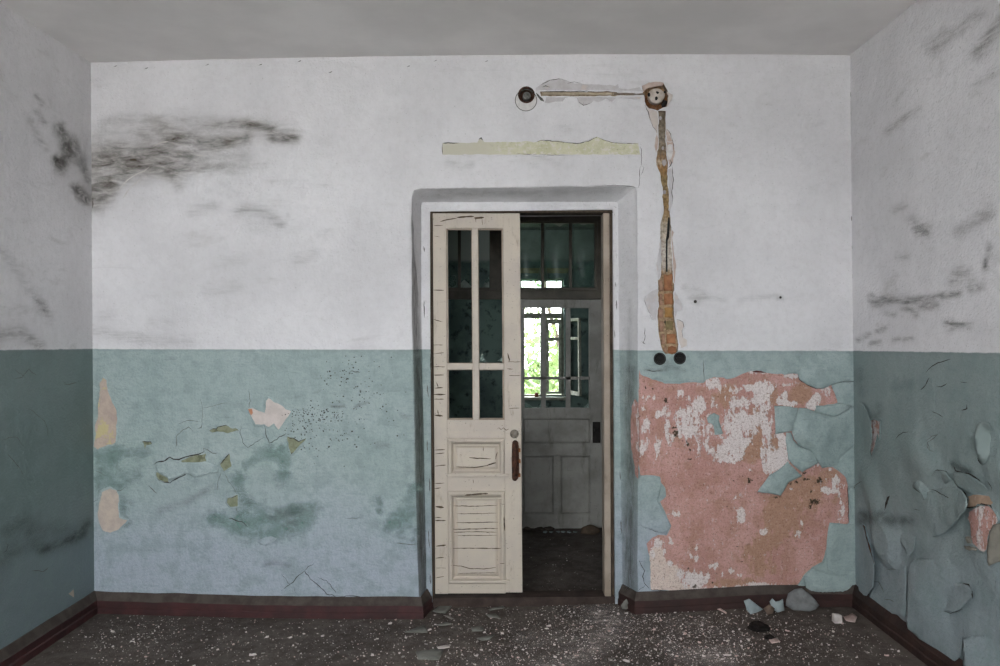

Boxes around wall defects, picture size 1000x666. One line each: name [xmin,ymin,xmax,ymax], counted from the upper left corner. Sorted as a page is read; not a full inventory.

peeling [441,136,641,157]
peeling [535,78,676,212]
spalling [656,228,688,349]
peeling [93,377,119,450]
peeling [247,396,307,456]
peeling [631,360,854,591]
peeling [97,486,129,534]
peeling [962,490,1000,554]
crack [281,565,360,597]